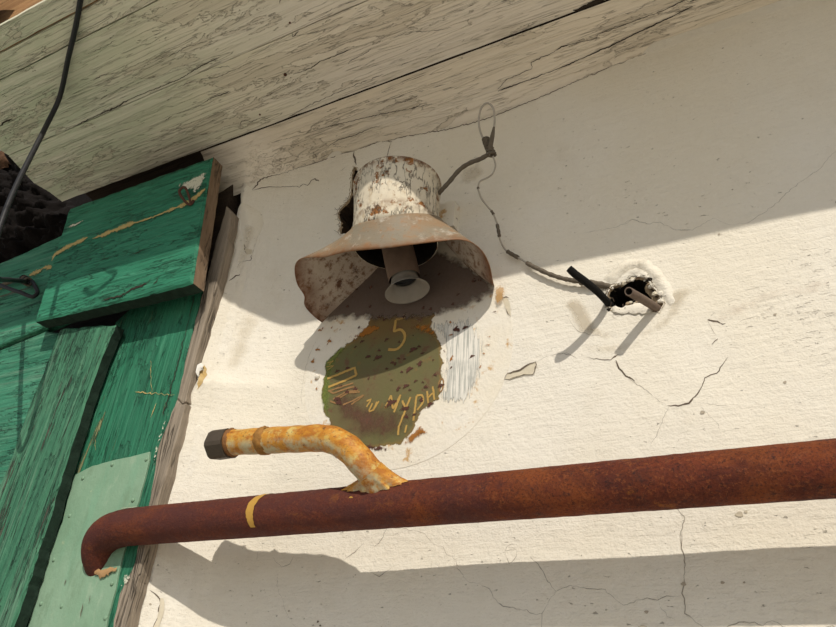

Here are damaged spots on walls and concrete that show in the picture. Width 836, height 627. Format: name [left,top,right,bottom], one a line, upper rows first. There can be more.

crack [252,0,694,190]
flaking render [334,166,358,236]
spalling [609,268,662,314]
flaking render [505,362,537,380]
crack [566,354,728,439]